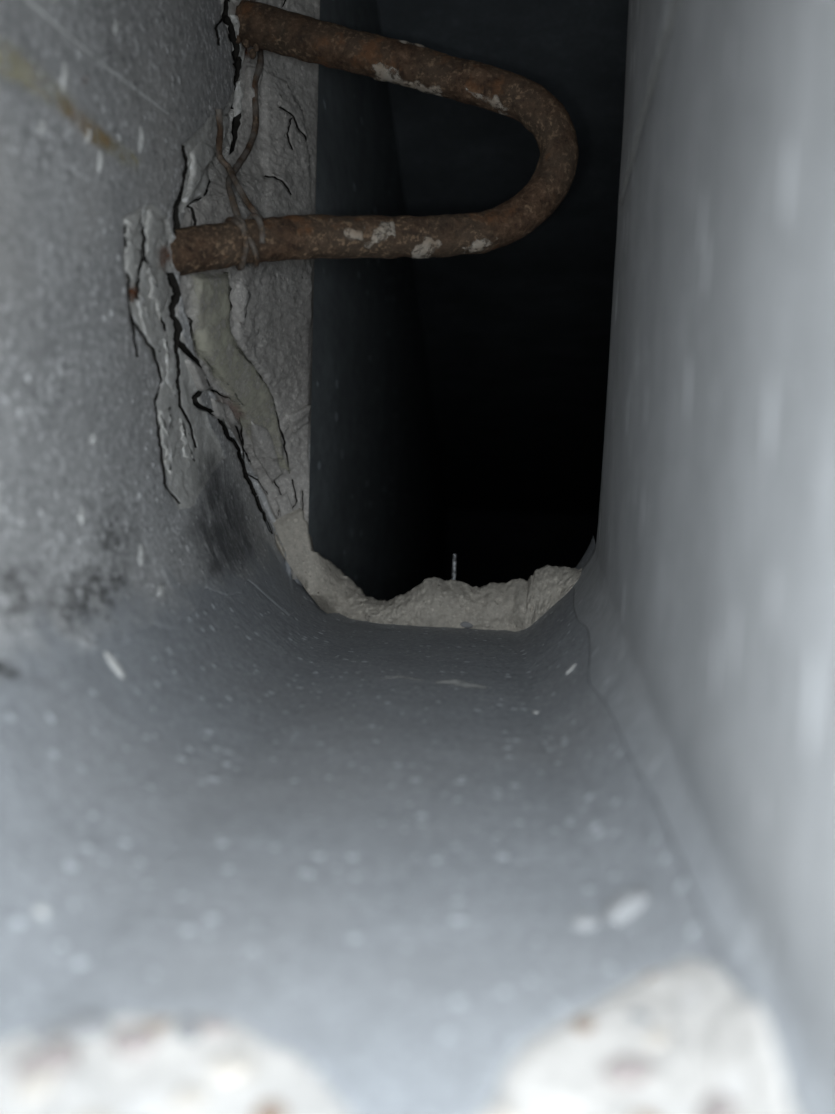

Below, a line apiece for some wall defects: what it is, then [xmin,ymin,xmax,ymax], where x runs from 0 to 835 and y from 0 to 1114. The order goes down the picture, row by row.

crack [172,145,211,235]
spalling [123,0,320,525]
crack [214,0,242,154]
crack [264,175,292,195]
crack [279,106,307,150]
crack [123,219,304,534]